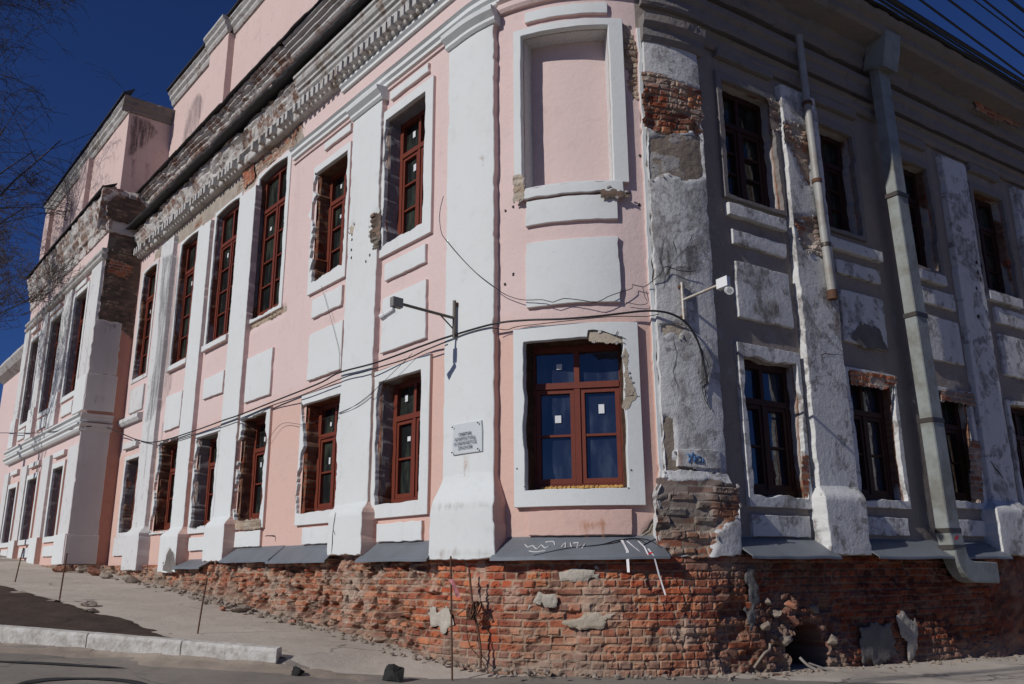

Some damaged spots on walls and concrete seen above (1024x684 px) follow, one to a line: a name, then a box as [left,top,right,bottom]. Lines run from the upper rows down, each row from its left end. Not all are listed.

flaking render [622,23,704,183]
flaking render [767,98,811,185]
flaking render [98,195,146,339]
flaking render [154,123,304,261]
flaking render [365,212,381,263]
flaking render [505,174,525,212]
flaking render [794,215,823,257]
flaking render [589,330,637,409]
flaking render [850,371,897,390]
flaking render [639,412,742,559]